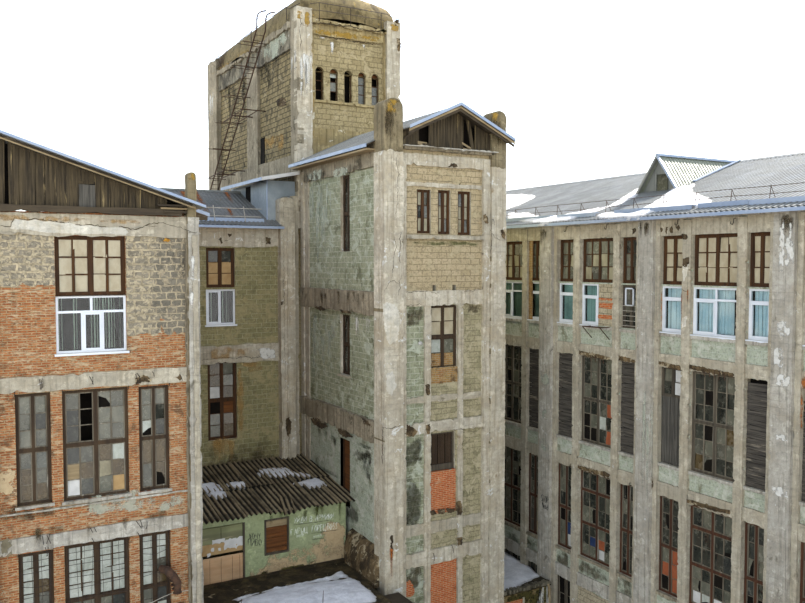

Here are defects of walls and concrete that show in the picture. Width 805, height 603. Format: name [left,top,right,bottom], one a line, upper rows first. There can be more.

crack [1,217,197,257]
spalling [128,373,155,389]
leakage [405,440,421,467]
leakage [406,486,421,525]